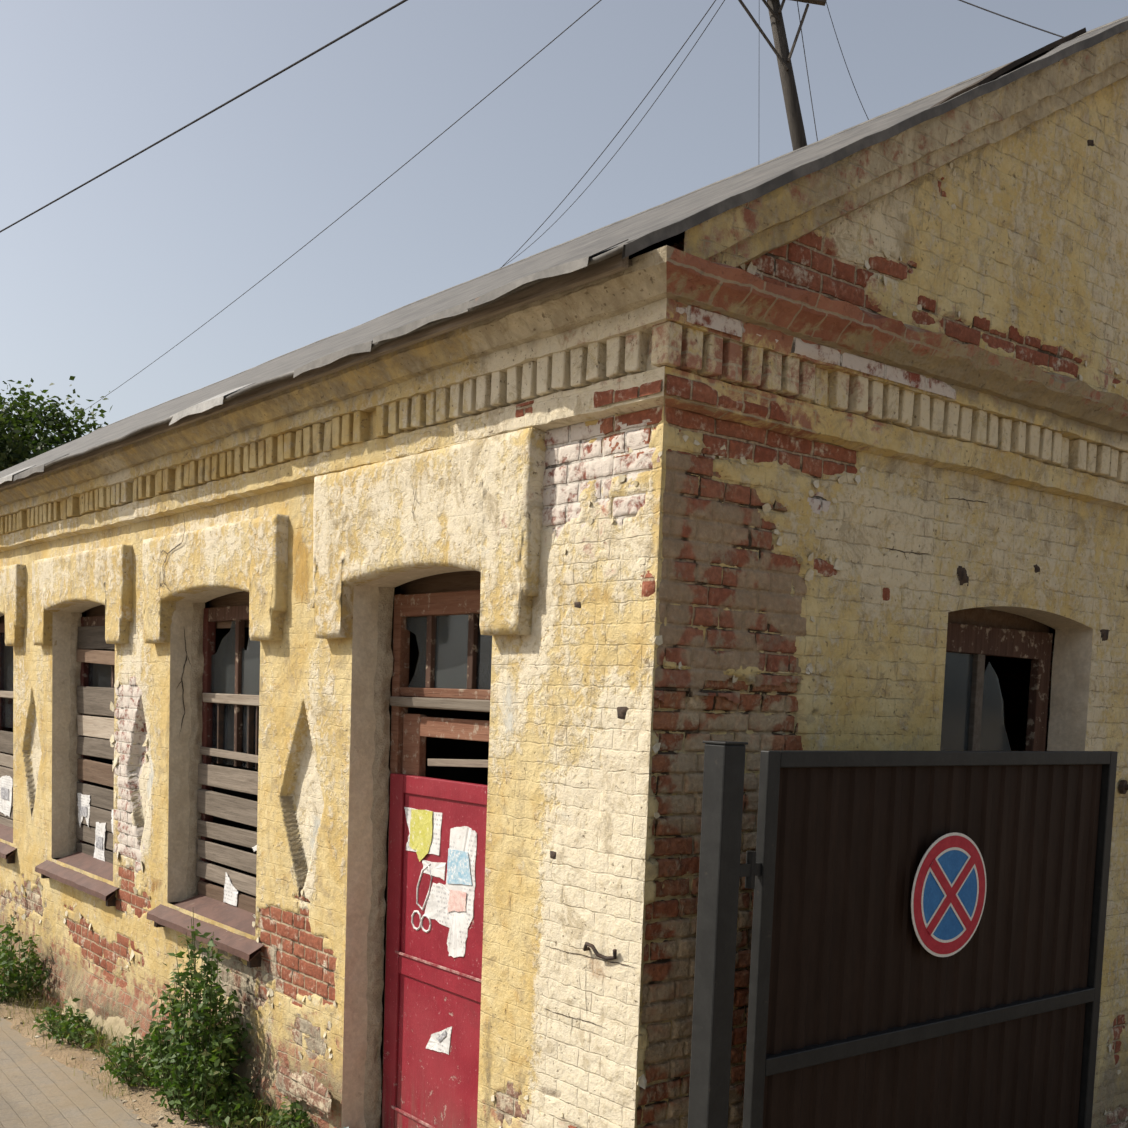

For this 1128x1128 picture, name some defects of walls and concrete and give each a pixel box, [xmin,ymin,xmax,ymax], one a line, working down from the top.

flaking render [740,231,917,317]
peeling [676,305,761,337]
peeling [791,337,956,400]
flaking render [912,295,1087,381]
crack [160,515,185,589]
spalling [542,374,866,1128]
peeling [110,676,152,922]
spalling [0,874,47,924]
spalling [63,904,145,988]
spalling [188,889,337,1117]
flaking render [491,1081,561,1128]